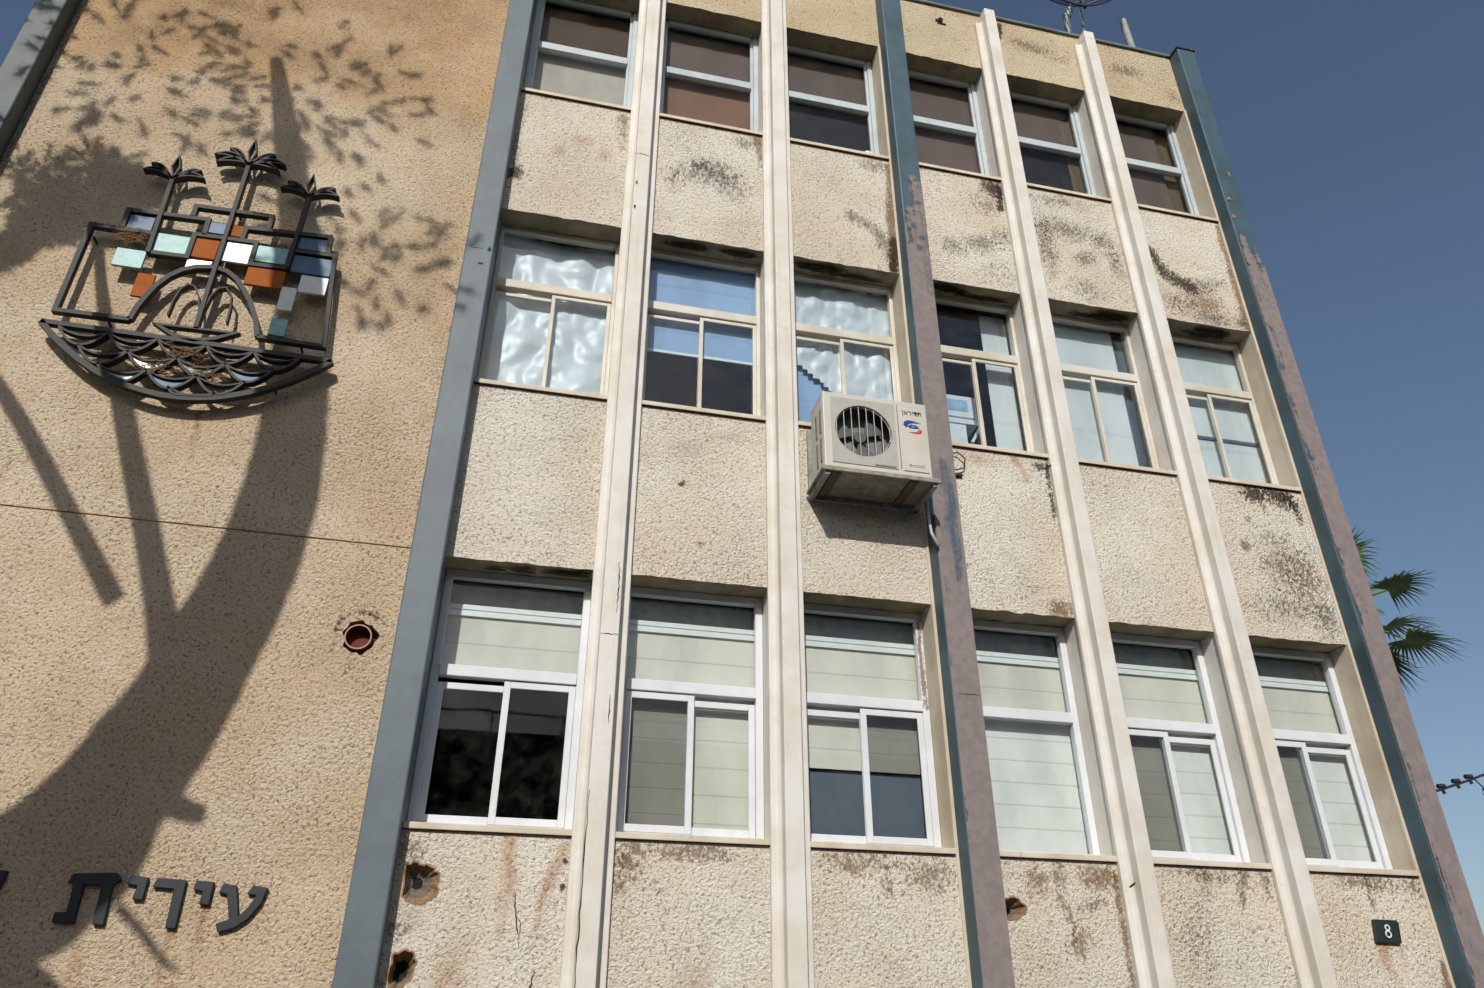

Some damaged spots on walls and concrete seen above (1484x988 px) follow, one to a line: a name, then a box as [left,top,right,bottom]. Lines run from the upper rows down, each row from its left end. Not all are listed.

damp [979,179,1005,212]
damp [1149,246,1209,306]
mould [1238,485,1303,525]
peeling [904,175,1028,988]
hole [400,861,441,905]
hole [386,949,418,988]